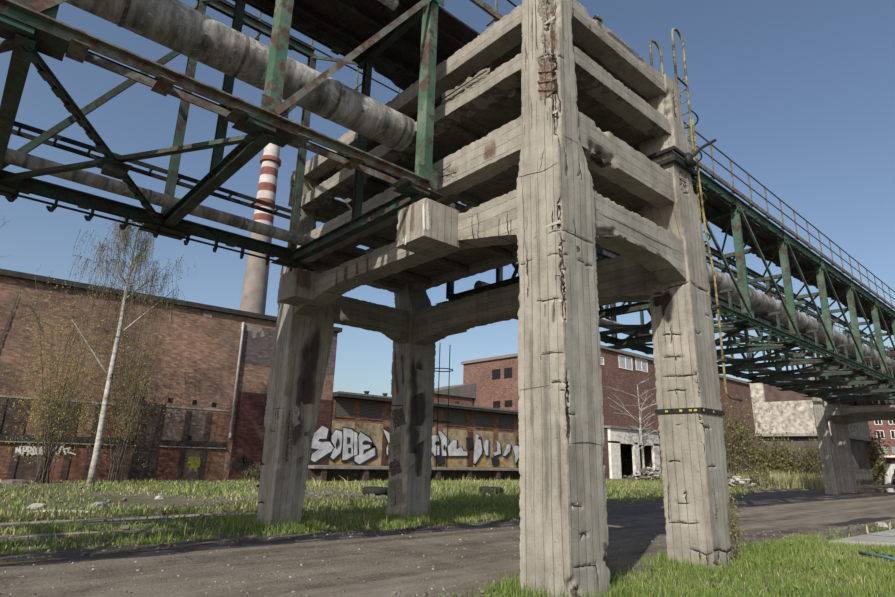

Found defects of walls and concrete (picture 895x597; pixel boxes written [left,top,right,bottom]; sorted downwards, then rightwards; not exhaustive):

spalling [537,0,558,117]
spalling [590,149,612,168]
water stain [653,291,673,322]
water stain [293,329,320,446]
water stain [394,355,425,477]
crack [663,314,714,467]
crack [667,486,699,524]
crack [694,549,731,566]